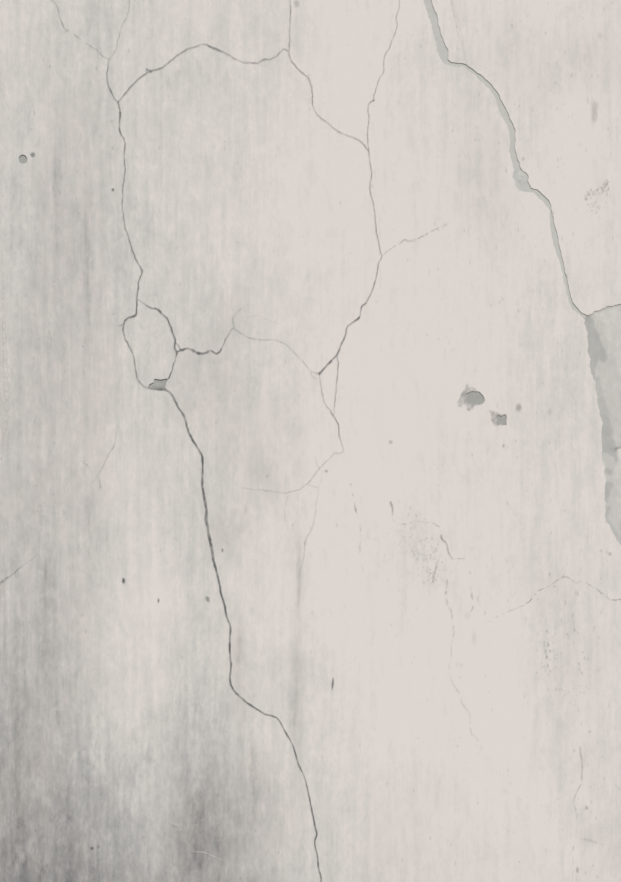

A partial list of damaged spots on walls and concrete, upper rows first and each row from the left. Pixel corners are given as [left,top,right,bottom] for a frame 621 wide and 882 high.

crack [424,0,587,319]
crack [123,255,322,879]
spalling [466,391,485,405]
flaking render [584,304,621,545]